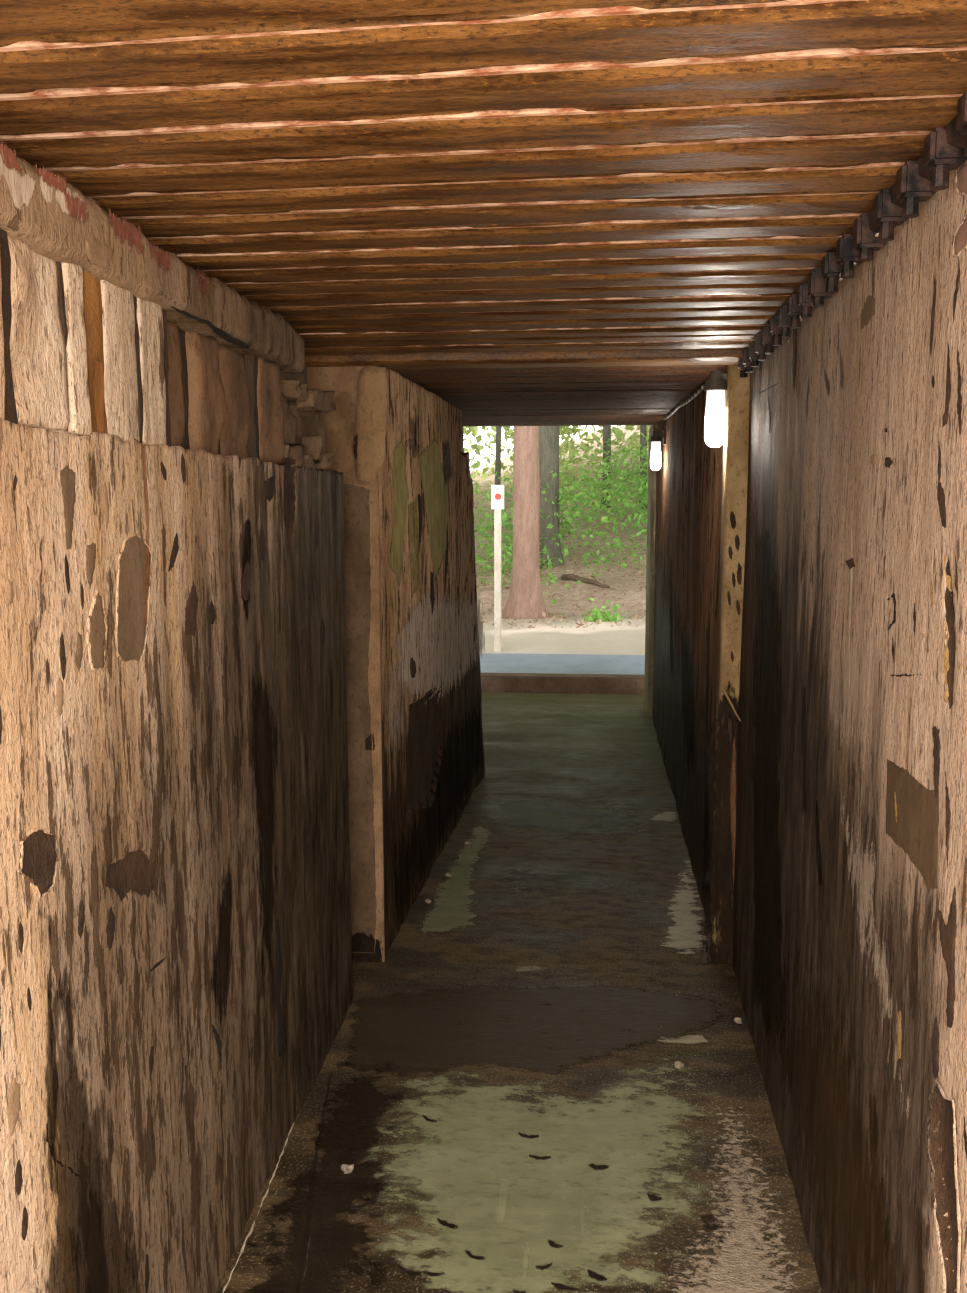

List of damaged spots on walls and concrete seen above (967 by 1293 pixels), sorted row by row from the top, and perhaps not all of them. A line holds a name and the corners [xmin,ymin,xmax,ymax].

peeling [0,142,88,224]
peeling [46,444,186,716]
damp [241,519,251,621]
peeling [18,828,59,899]
damp [211,873,232,1025]
damp [252,673,278,974]
damp [660,528,906,1293]
peeling [886,726,951,889]
peeling [15,1159,28,1241]
damp [28,969,139,1293]
damp [222,985,722,1293]
spalling [927,887,961,1293]